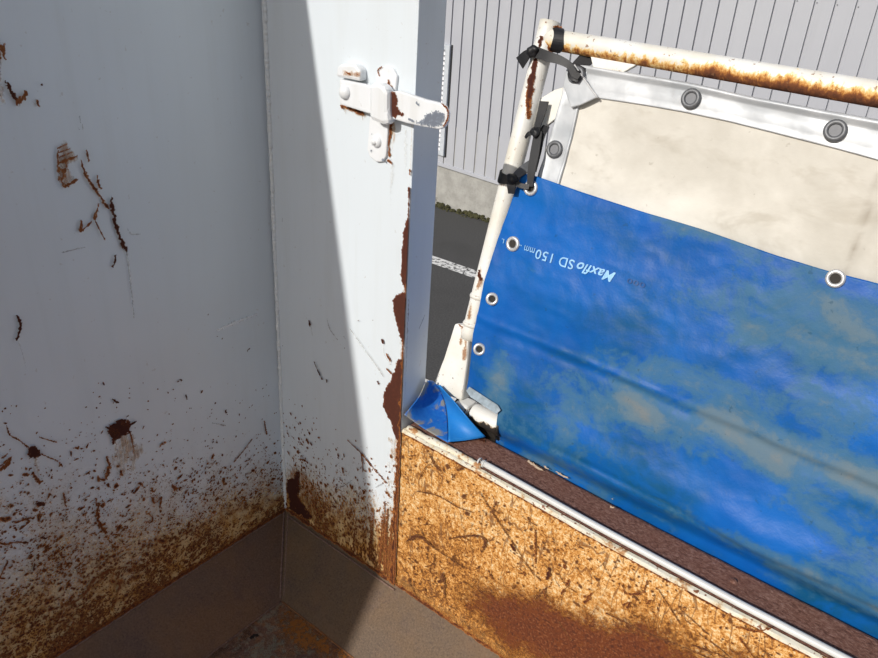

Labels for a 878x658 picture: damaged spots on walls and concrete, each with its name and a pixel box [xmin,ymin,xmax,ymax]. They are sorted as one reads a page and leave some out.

rust [5,80,40,107]
rust [525,58,538,119]
rust [57,144,78,188]
rust [0,382,811,658]